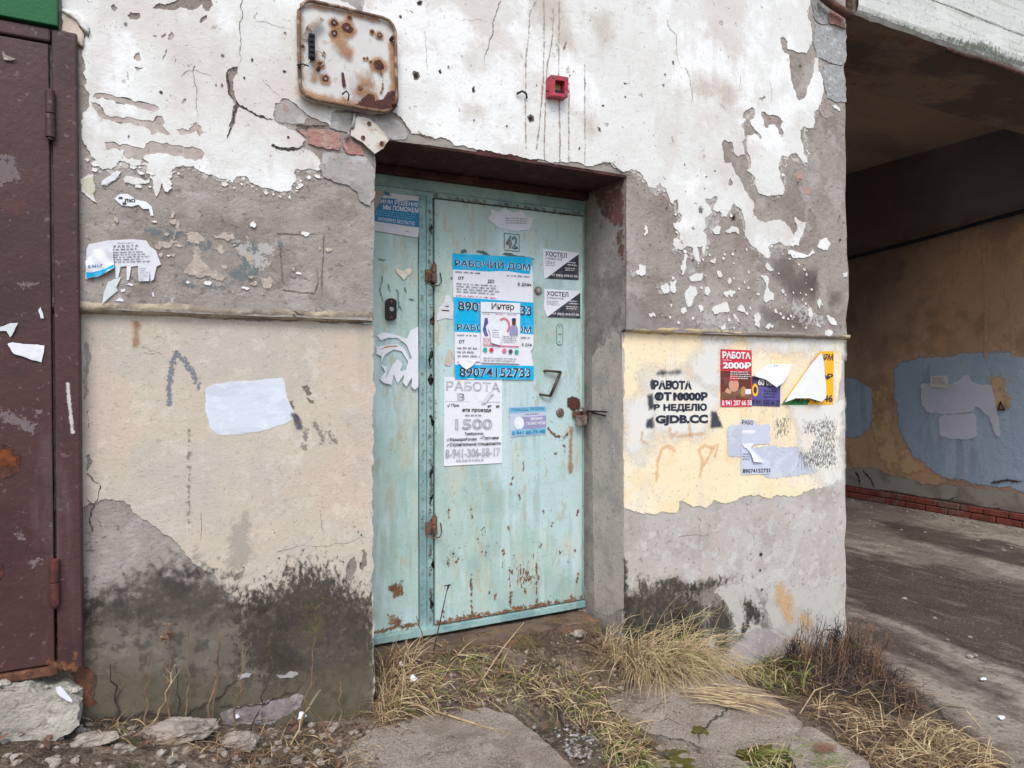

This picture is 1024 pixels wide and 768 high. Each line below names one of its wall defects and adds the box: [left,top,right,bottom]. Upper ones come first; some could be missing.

flaking render [82,99,408,206]
crack [182,3,328,150]
corrosion [298,3,398,113]
flaking render [732,0,847,200]
peeling [151,210,256,286]
peeling [241,276,273,290]
peeling [594,170,807,324]
peeling [746,288,823,329]
peeling [845,384,1024,513]
damp [880,521,1024,566]
damp [55,521,374,725]
damp [622,547,1024,695]